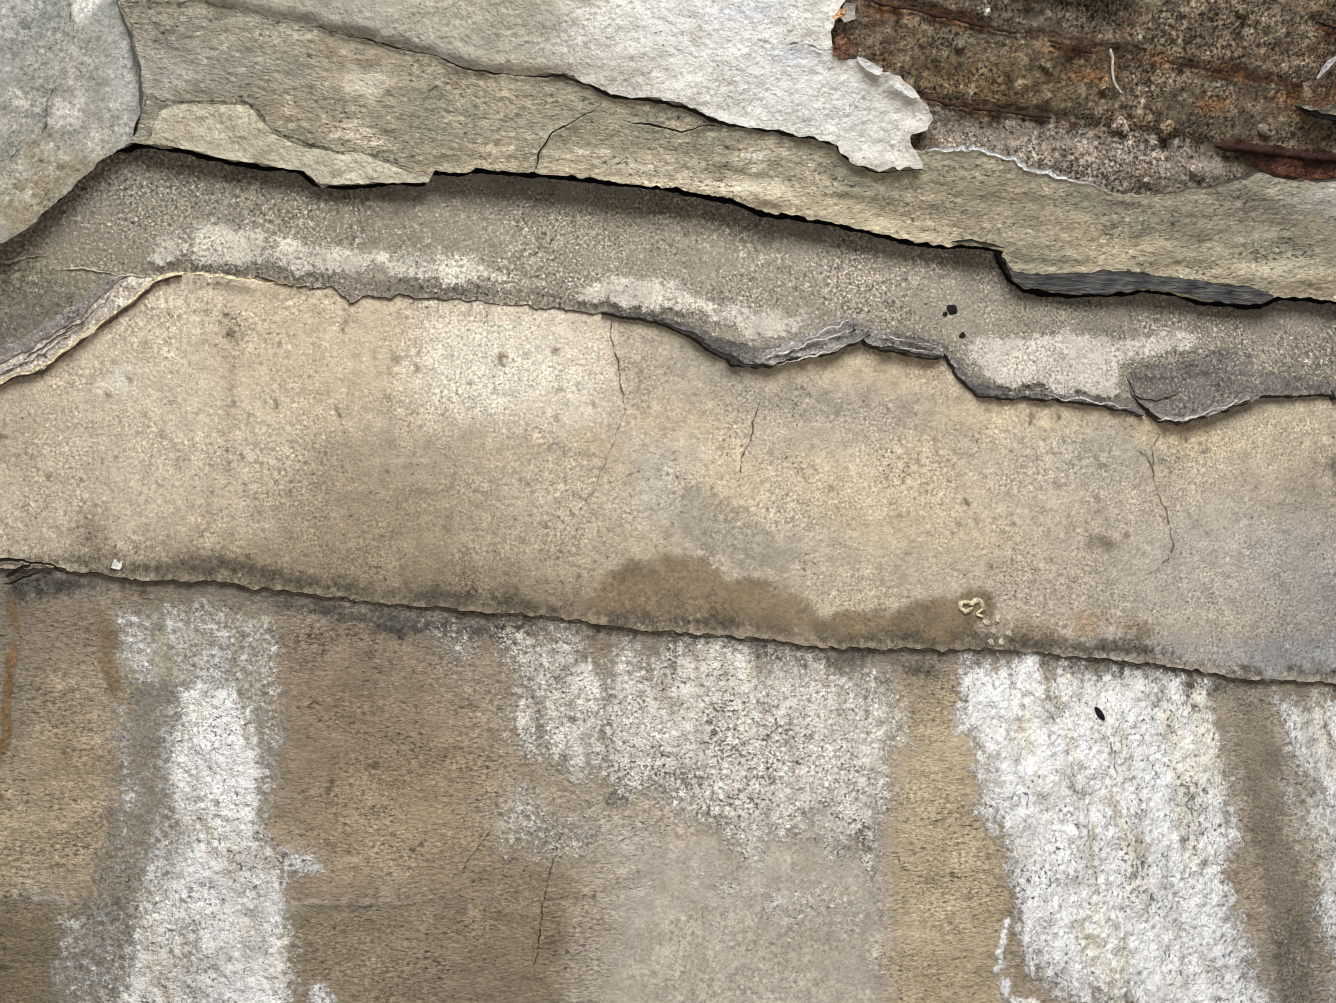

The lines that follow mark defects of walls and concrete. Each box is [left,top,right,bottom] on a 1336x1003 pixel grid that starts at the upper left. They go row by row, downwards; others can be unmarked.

crack [53,0,1336,310]
spalling [207,0,1336,195]
rust [830,7,857,60]
rust [864,0,1304,93]
rust [1215,139,1336,181]
spalling [1001,257,1274,304]
crack [588,321,626,496]
spalling [602,311,1336,426]
crack [0,557,70,585]
crack [275,590,998,653]
damp [40,592,337,1003]
damp [421,554,1336,1003]